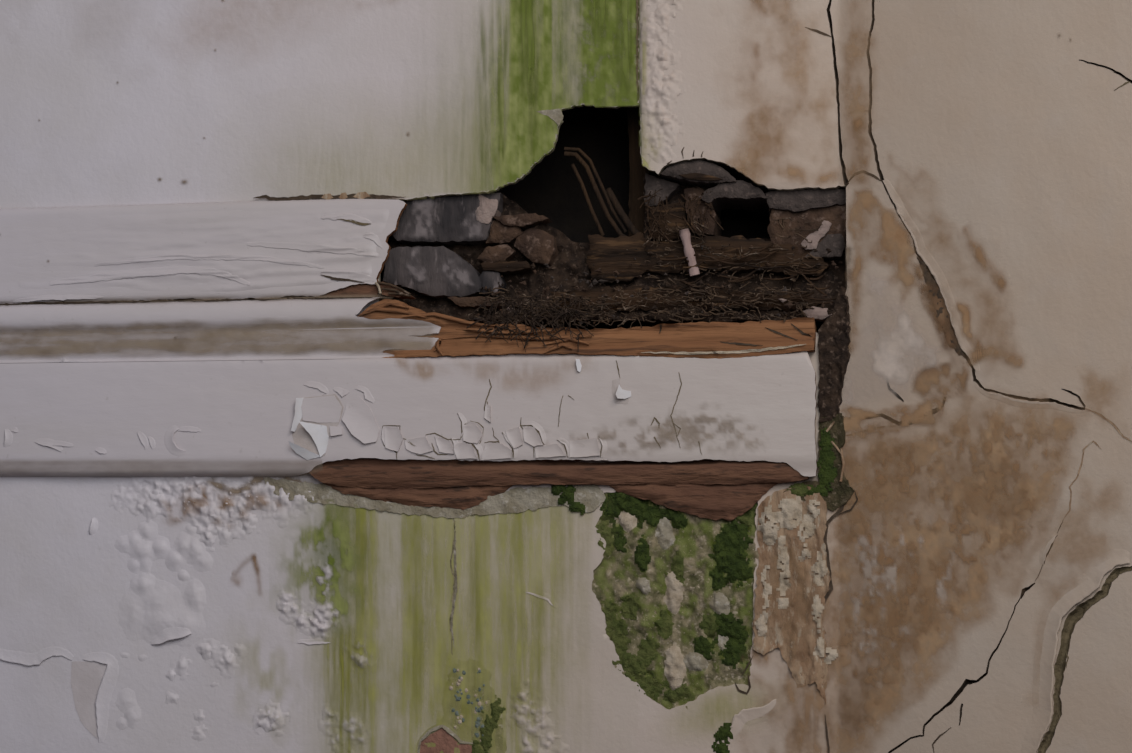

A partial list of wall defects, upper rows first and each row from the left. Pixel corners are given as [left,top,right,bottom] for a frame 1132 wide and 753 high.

crack [0,275,364,305]
crack [254,192,404,226]
spalling [383,193,503,299]
spalling [767,205,847,254]
crack [805,0,1132,753]
leakage [209,476,264,494]
spalling [264,286,855,709]
leakage [830,159,1074,753]
leakage [276,558,369,677]
peeling [71,652,119,742]
leakage [498,679,570,753]
spalling [714,699,780,753]